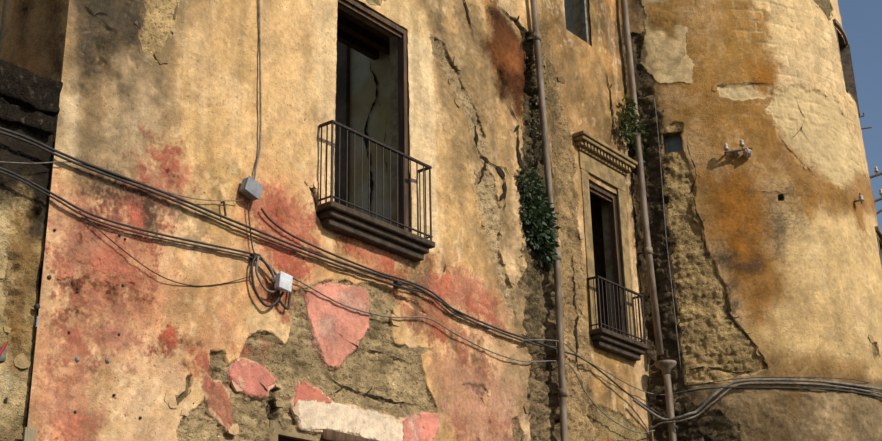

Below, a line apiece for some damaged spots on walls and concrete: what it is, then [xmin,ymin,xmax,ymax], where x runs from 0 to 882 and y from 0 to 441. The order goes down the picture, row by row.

rust [484,0,527,122]
flaking render [639,0,695,84]
spalling [812,0,834,24]
crack [472,105,524,210]
flaking render [712,80,867,191]
rust [765,125,876,230]
peeling [41,145,196,441]
peeling [151,324,332,435]
spalling [660,119,771,387]
crack [680,317,769,375]